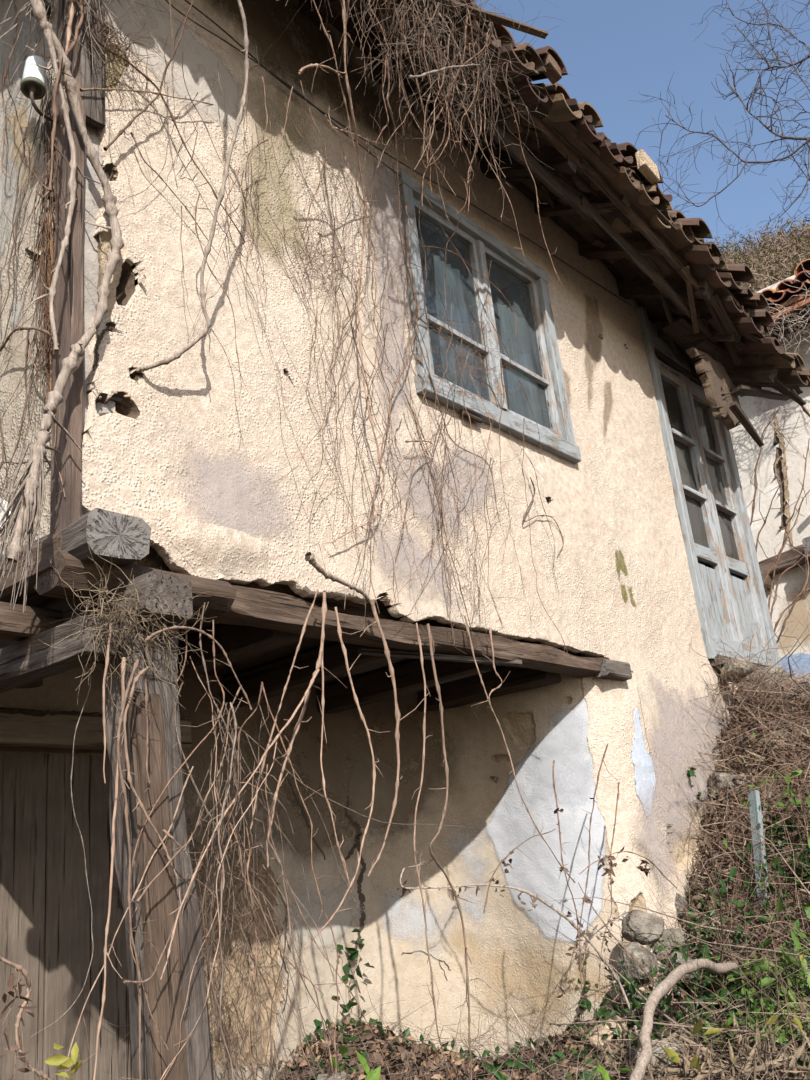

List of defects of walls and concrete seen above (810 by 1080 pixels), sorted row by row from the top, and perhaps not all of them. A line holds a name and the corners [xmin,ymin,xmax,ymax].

flaking render [97,231,135,332]
hole [95,391,140,419]
hole [129,367,143,381]
peeling [631,708,655,817]
crack [287,778,366,949]
peeling [486,697,606,943]
flaking render [615,893,646,914]